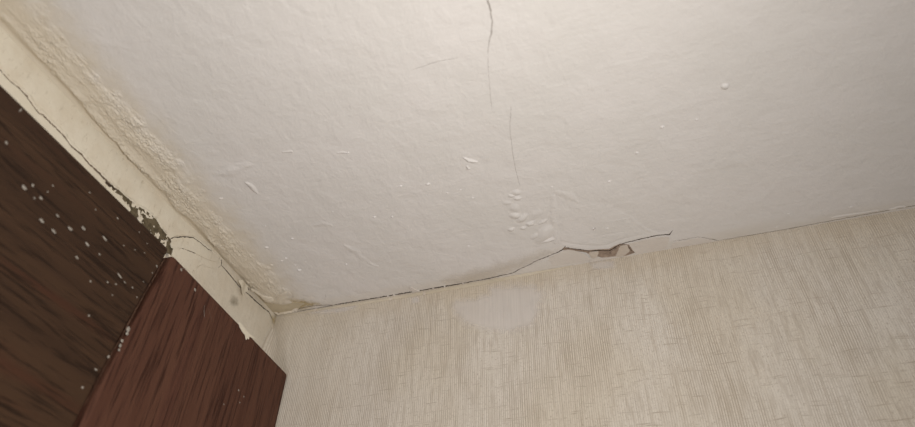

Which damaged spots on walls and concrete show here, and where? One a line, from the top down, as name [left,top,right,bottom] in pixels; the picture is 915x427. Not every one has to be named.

crack [0,66,131,211]
peeling [0,0,304,315]
crack [487,0,519,182]
crack [161,235,275,320]
crack [297,249,563,312]
flaking render [548,231,672,267]